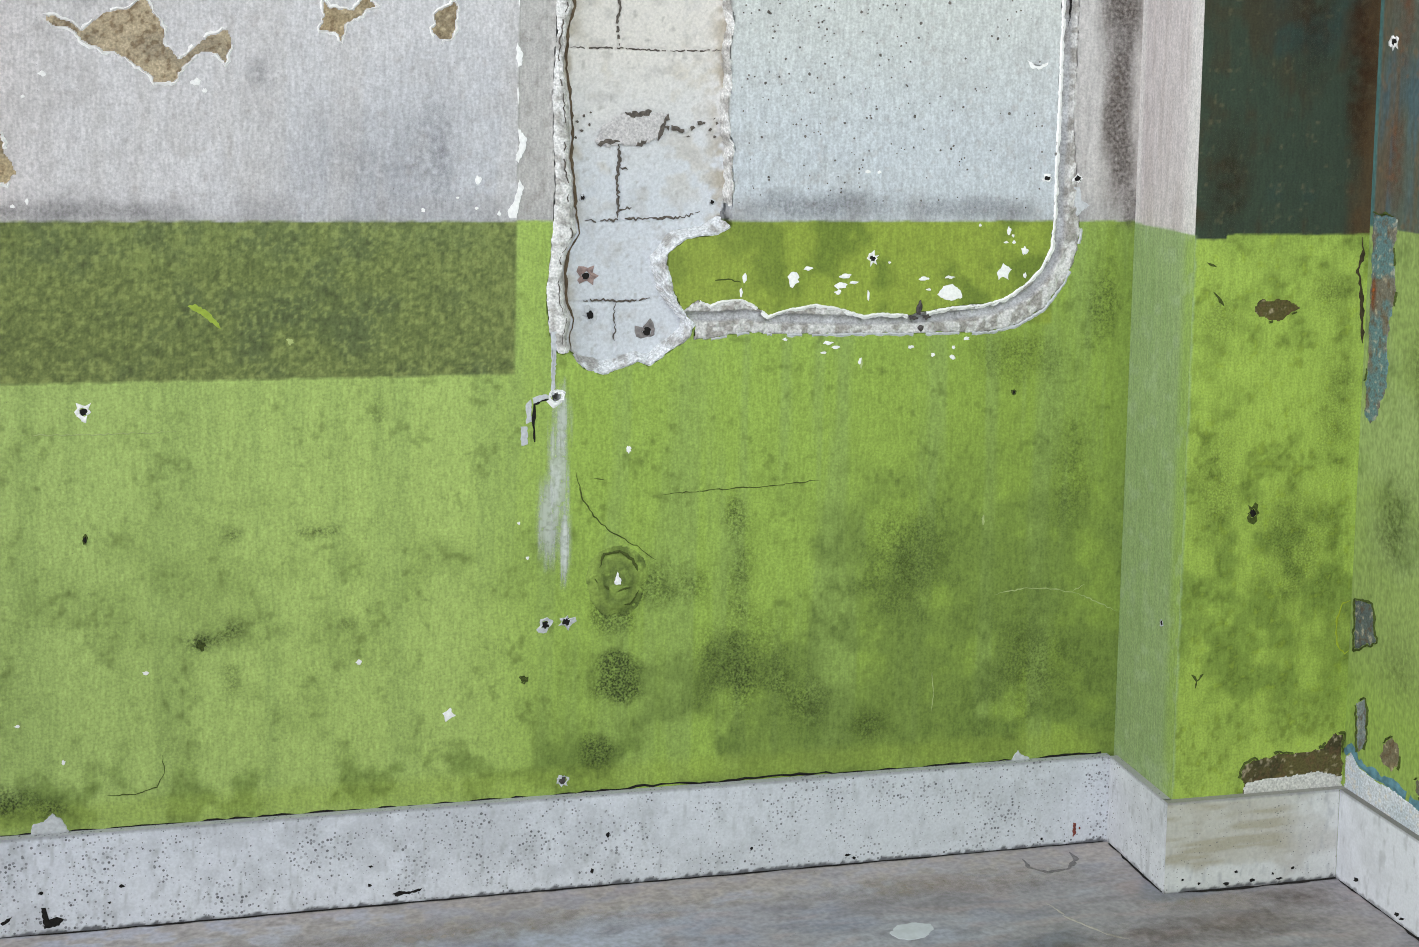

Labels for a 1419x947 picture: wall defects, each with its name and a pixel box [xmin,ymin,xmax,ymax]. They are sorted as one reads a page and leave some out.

peeling [43,0,233,93]
peeling [317,0,381,44]
peeling [0,132,16,188]
damp [1103,53,1136,205]
spalling [520,0,1090,446]
peeling [1255,299,1300,324]
crack [1356,237,1365,343]
peeling [1363,211,1398,423]
damp [540,399,569,575]
damp [595,651,638,702]
peeling [1238,697,1419,835]